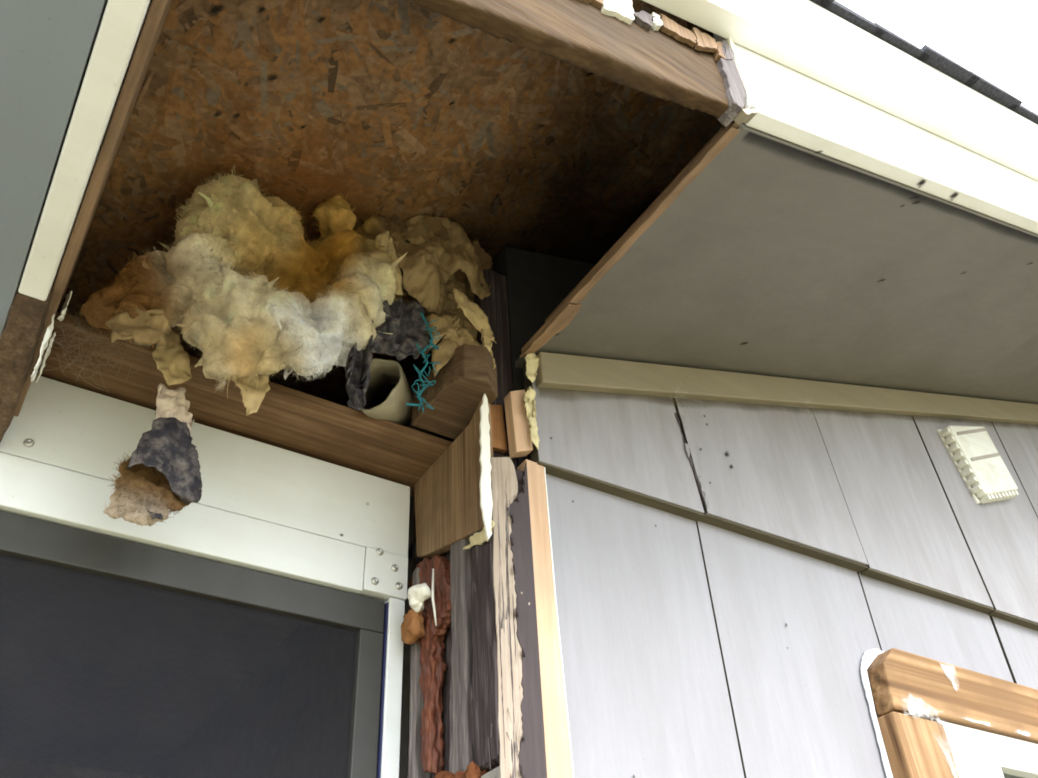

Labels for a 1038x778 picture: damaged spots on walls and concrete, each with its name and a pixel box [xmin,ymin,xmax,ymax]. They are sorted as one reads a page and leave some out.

peeling [31,291,72,382]
peeling [463,394,495,549]
crack [675,412,708,509]
damp [409,555,452,774]
peeling [506,462,547,778]